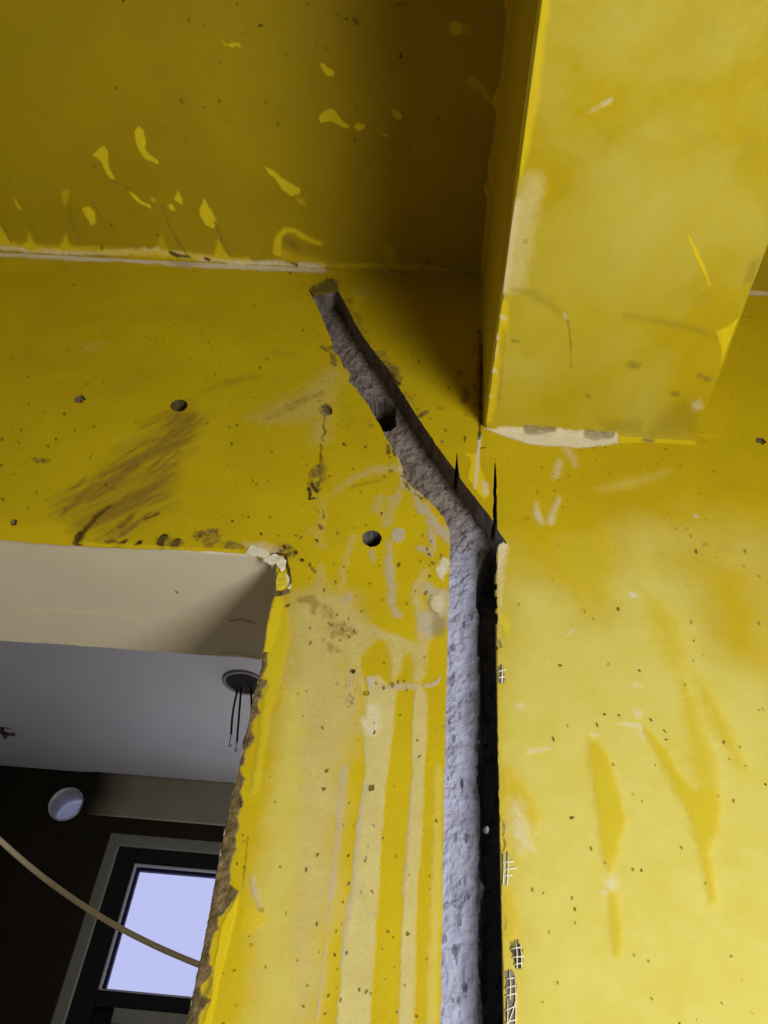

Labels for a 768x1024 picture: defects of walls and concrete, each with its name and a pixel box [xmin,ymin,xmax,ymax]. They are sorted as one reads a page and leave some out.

peeling [187,533,379,1024]
damp [337,570,429,1024]
damp [386,543,401,617]
flaking render [389,677,440,689]
flaking render [485,426,618,448]
peeling [497,529,768,1024]